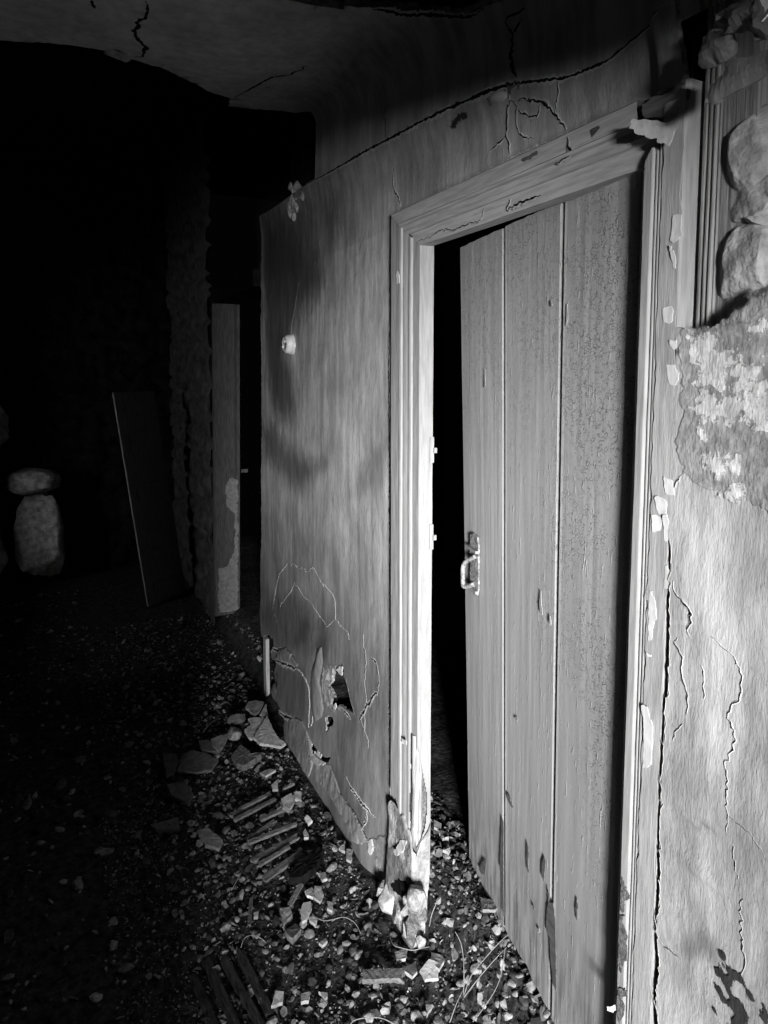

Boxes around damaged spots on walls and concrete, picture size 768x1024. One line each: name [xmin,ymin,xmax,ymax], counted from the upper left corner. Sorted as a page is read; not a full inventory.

crack [127,0,154,58]
crack [233,66,307,98]
flaking render [629,0,768,146]
crack [306,6,658,831]
peeling [651,289,768,542]
peeling [217,477,239,613]
crack [275,659,297,672]
crack [278,710,295,722]
spalling [321,663,355,732]
crack [653,541,768,1024]
spalling [368,795,431,949]
peeling [713,950,768,1024]